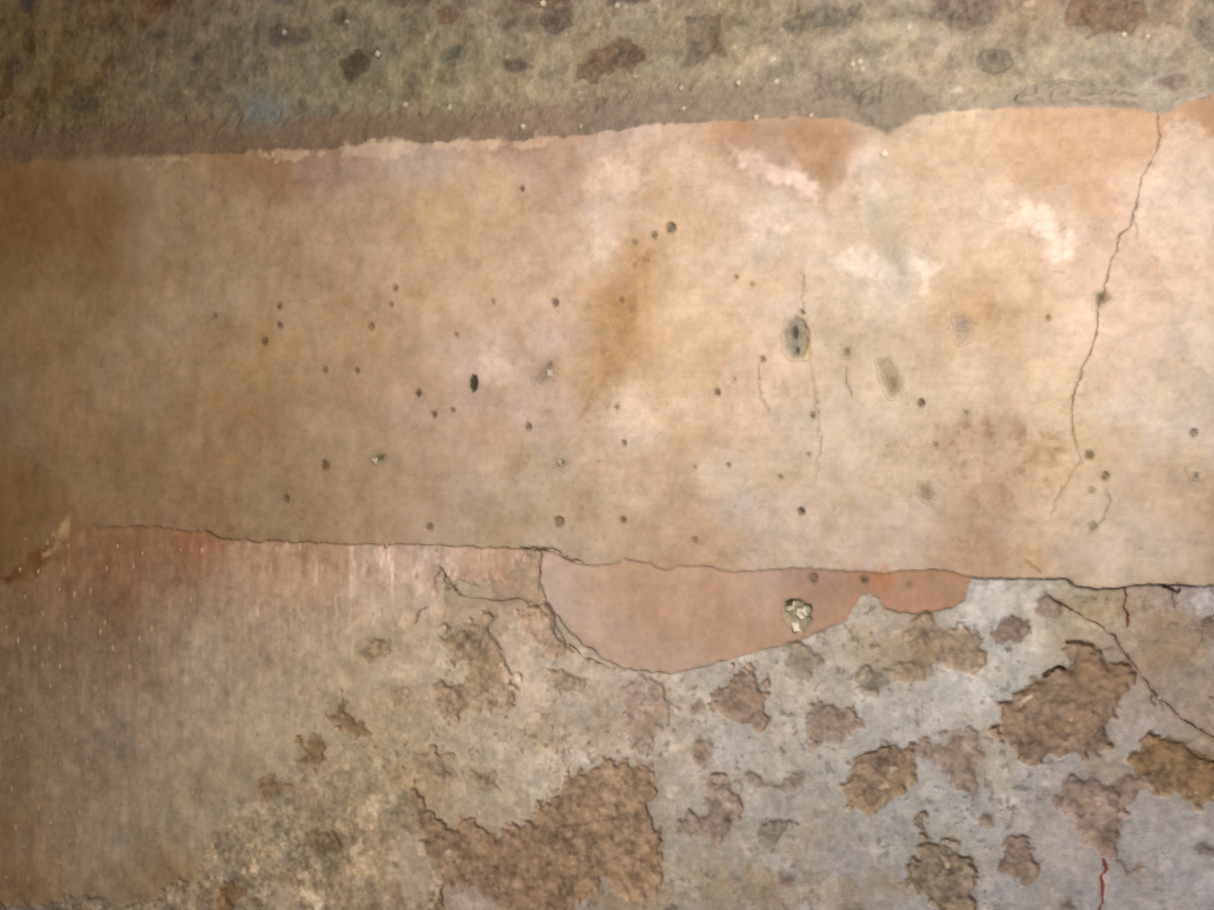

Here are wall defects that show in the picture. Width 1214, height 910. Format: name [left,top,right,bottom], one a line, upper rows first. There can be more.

damp [0,152,196,286]
damp [723,108,949,302]
damp [974,191,1082,266]
crack [1050,108,1163,516]
crack [1093,487,1113,528]
spalling [253,686,377,806]
spalling [350,635,395,667]
crack [412,545,611,670]
spalling [404,592,1214,910]
crack [1019,558,1214,856]
spalling [212,870,248,910]
spalling [301,825,353,869]